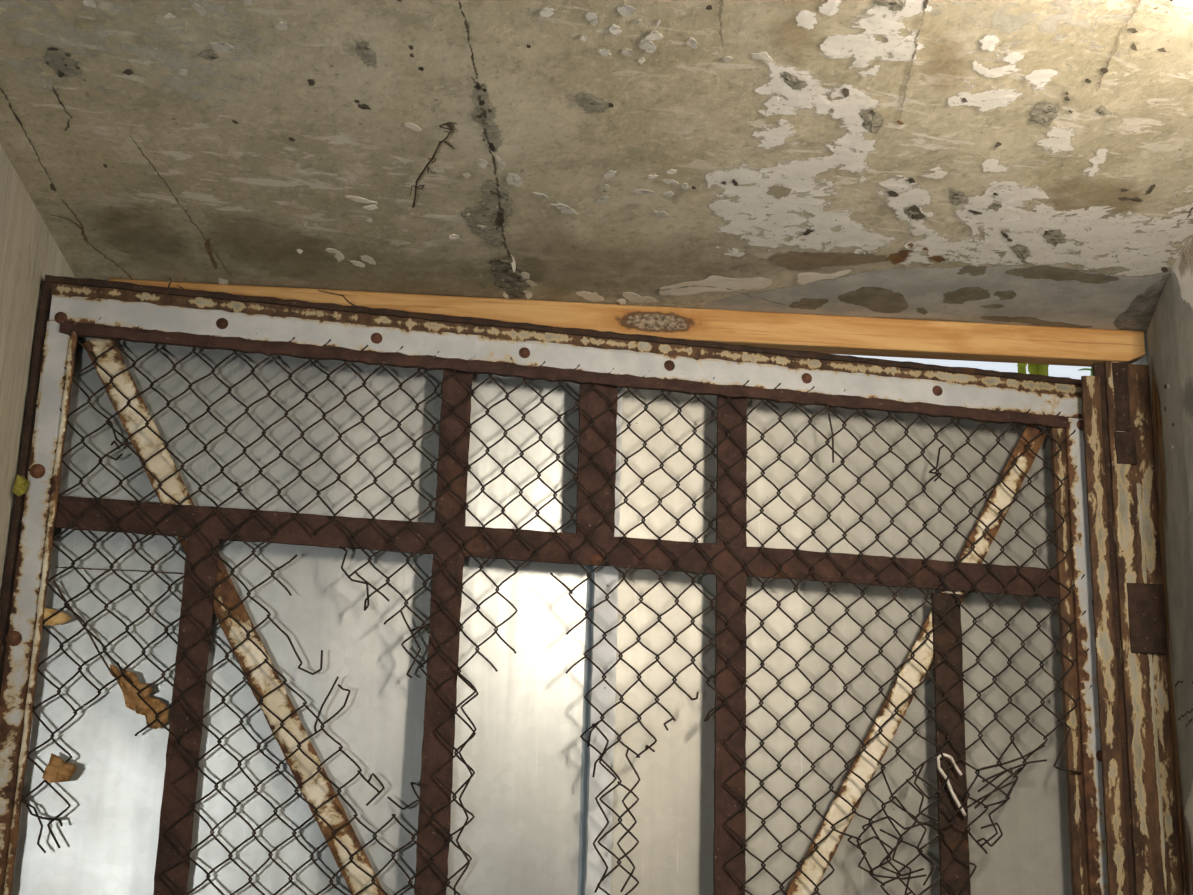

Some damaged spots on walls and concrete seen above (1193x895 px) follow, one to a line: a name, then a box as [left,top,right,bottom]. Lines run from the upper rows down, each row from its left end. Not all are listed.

peeling [581,2,663,64]
crack [897,0,929,125]
crack [1097,0,1141,90]
crack [457,0,513,262]
peeling [632,0,1193,277]
crack [0,88,133,280]
peeling [576,275,790,306]
peeling [796,270,852,285]
damp [770,252,886,270]
damp [790,287,928,315]
damp [943,266,1091,328]
damp [1006,266,1119,284]